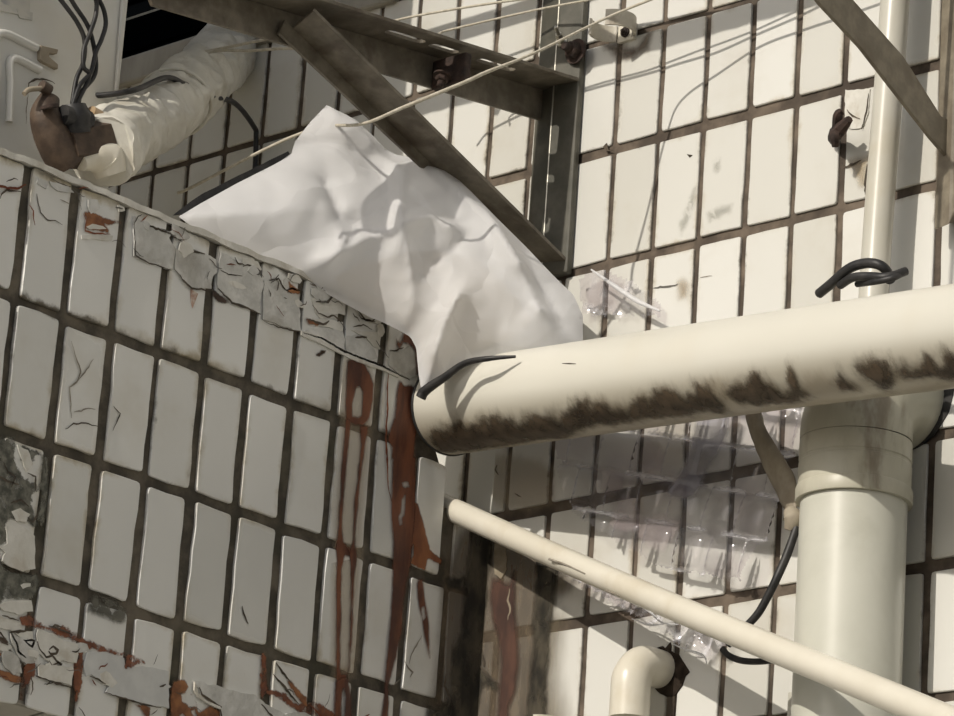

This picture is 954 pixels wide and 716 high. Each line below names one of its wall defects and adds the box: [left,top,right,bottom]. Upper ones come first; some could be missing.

peeling [36,178,100,214]
flaking render [114,205,418,380]
corrosion [397,333,419,375]
spalling [0,437,89,694]
spalling [89,595,126,623]
corrosion [170,680,220,716]
corrosion [260,359,373,716]
corrosion [382,374,442,716]
damp [427,532,568,716]